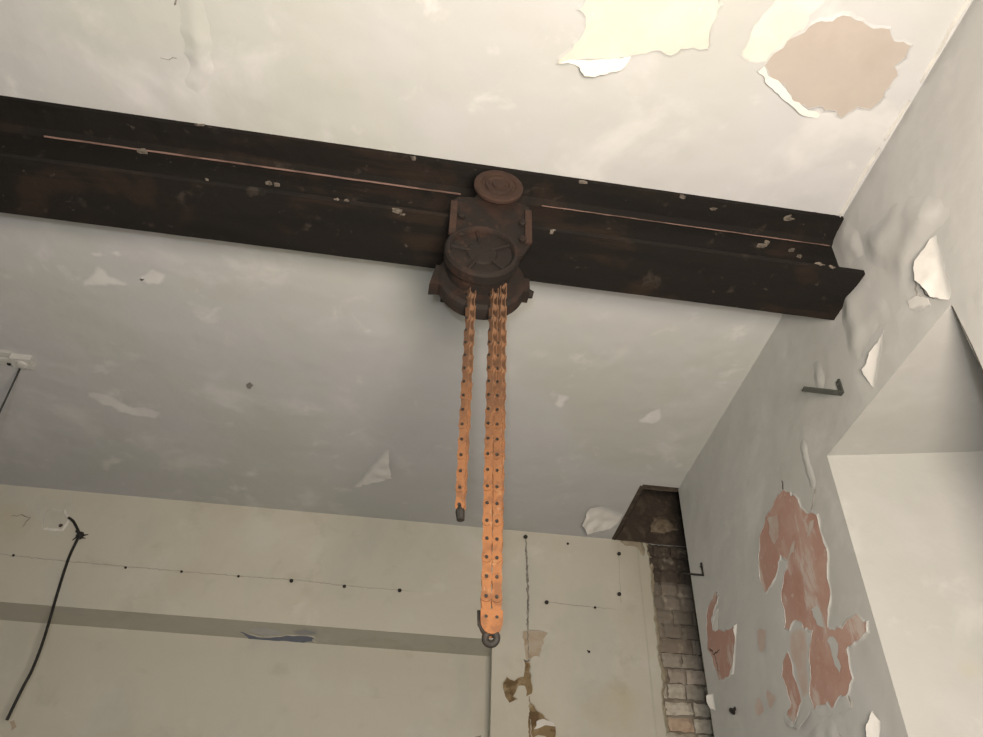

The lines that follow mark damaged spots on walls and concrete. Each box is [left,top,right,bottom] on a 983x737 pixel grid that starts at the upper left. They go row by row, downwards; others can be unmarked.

peeling [555,0,724,77]
peeling [737,0,914,120]
peeling [908,235,951,312]
peeling [350,447,392,490]
peeling [582,506,624,535]
flaking render [620,540,737,737]
peeling [757,481,870,730]
flaking render [501,629,557,737]
peeling [866,711,881,737]